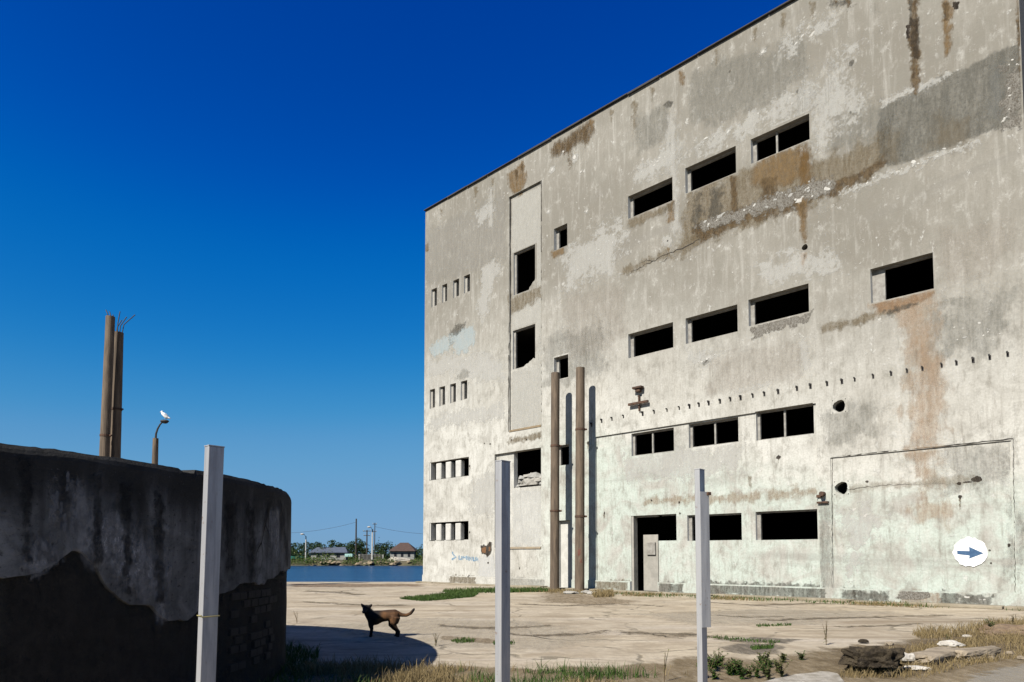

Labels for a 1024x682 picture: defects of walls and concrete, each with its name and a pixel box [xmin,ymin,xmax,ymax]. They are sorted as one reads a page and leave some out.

corrosion [906,0,920,94]
corrosion [942,0,954,55]
corrosion [509,162,527,195]
corrosion [552,120,594,164]
peeling [633,43,863,251]
flaking render [693,140,981,232]
damp [680,45,1022,255]
crack [623,239,700,276]
damp [93,476,103,563]
spalling [4,483,198,682]
damp [120,483,132,594]
spalling [216,572,286,682]